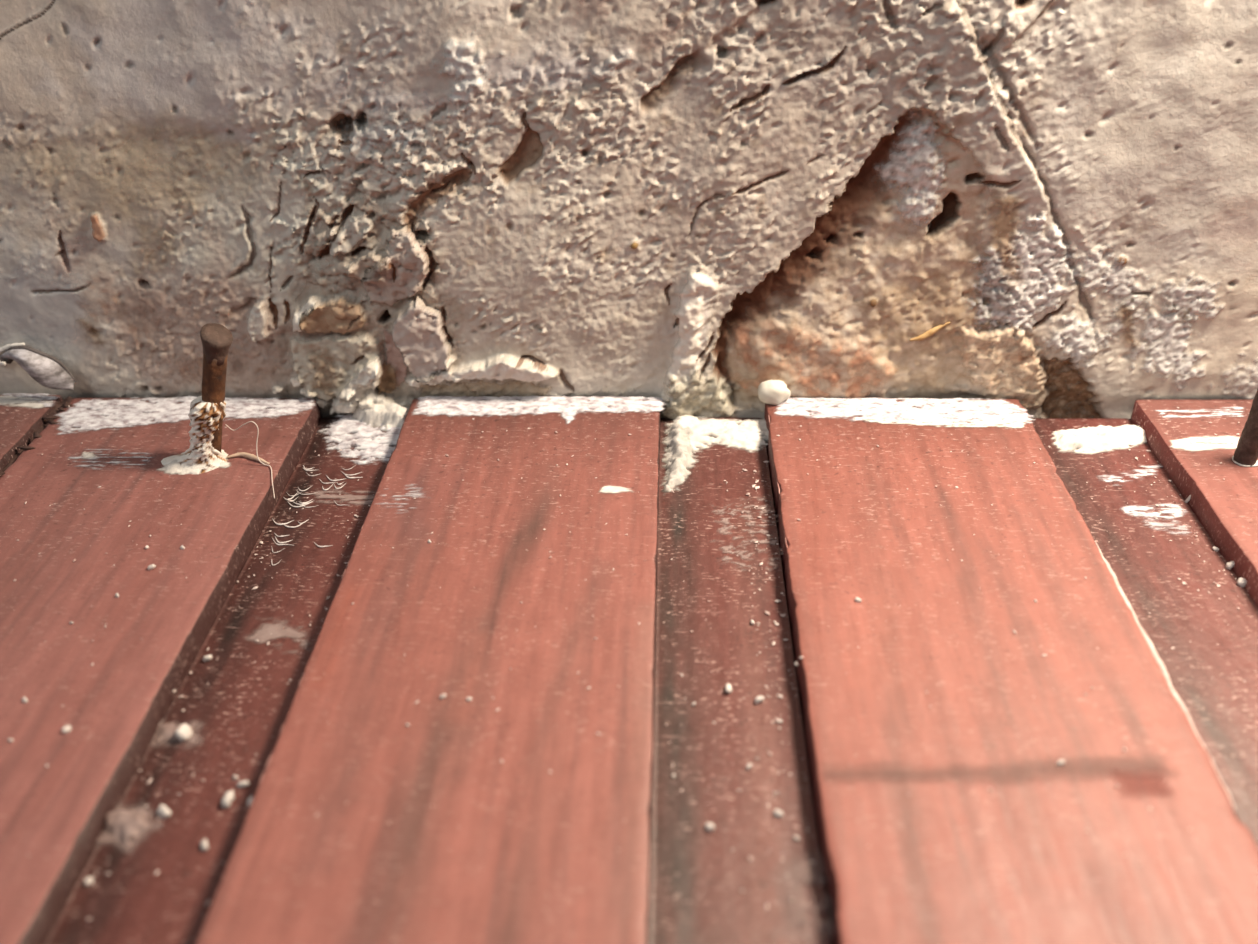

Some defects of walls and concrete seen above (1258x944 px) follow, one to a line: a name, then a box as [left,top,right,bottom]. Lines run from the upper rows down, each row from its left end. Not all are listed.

crack [0,0,55,39]
crack [999,0,1053,58]
spalling [499,112,543,183]
flaking render [248,196,452,415]
flaking render [712,108,1102,419]
water stain [972,213,1223,389]